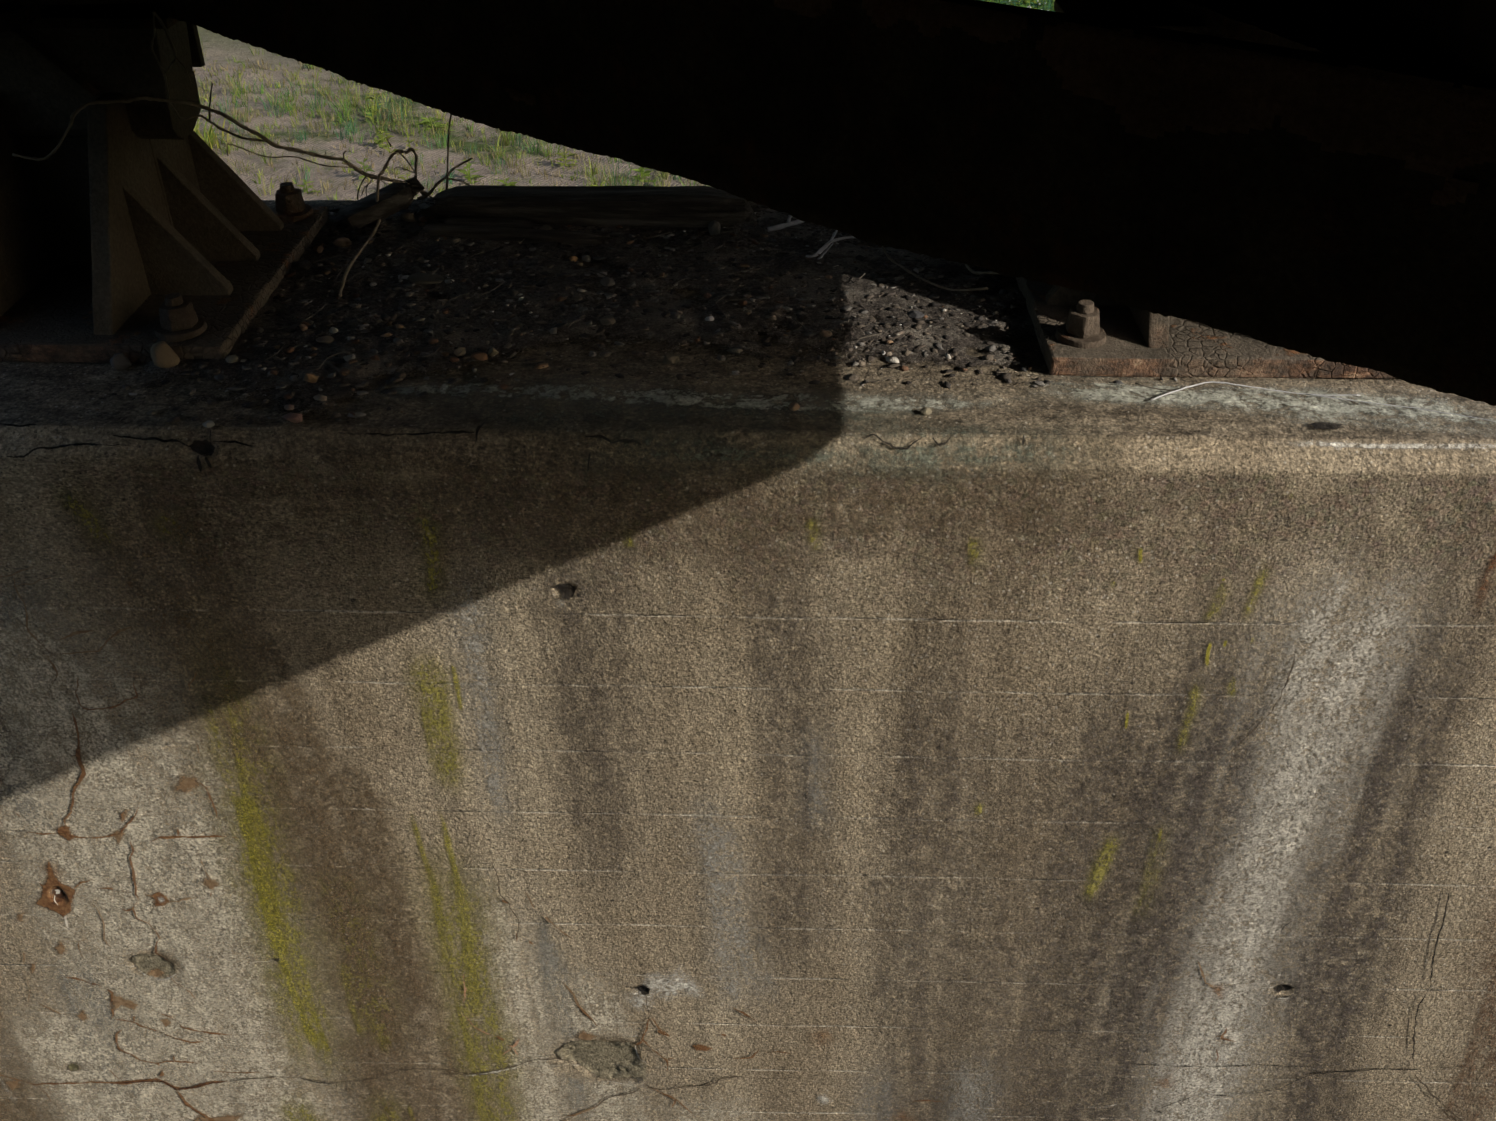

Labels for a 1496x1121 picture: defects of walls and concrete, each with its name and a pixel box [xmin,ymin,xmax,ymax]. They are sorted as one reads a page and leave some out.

corrosion [17,861,92,955]
crack [0,566,574,1121]
water stain [0,494,647,1121]
water stain [647,968,699,997]
crack [563,1018,822,1121]
water stain [752,592,825,947]
crack [1137,891,1463,1121]